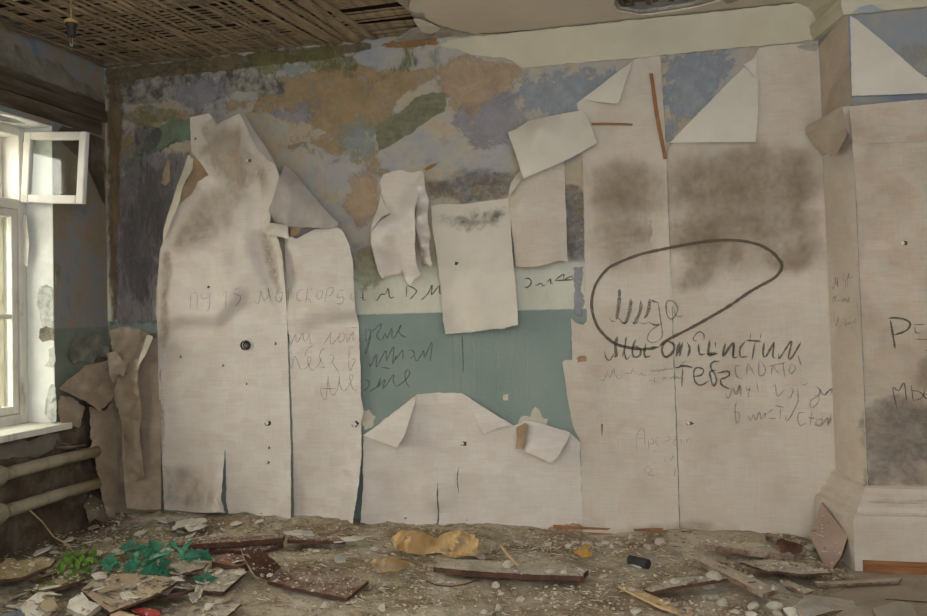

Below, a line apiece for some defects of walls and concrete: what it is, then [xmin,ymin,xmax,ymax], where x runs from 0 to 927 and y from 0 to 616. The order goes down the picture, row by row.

flaking render [614,0,738,14]
flaking render [0,0,476,205]
flaking render [0,378,164,557]